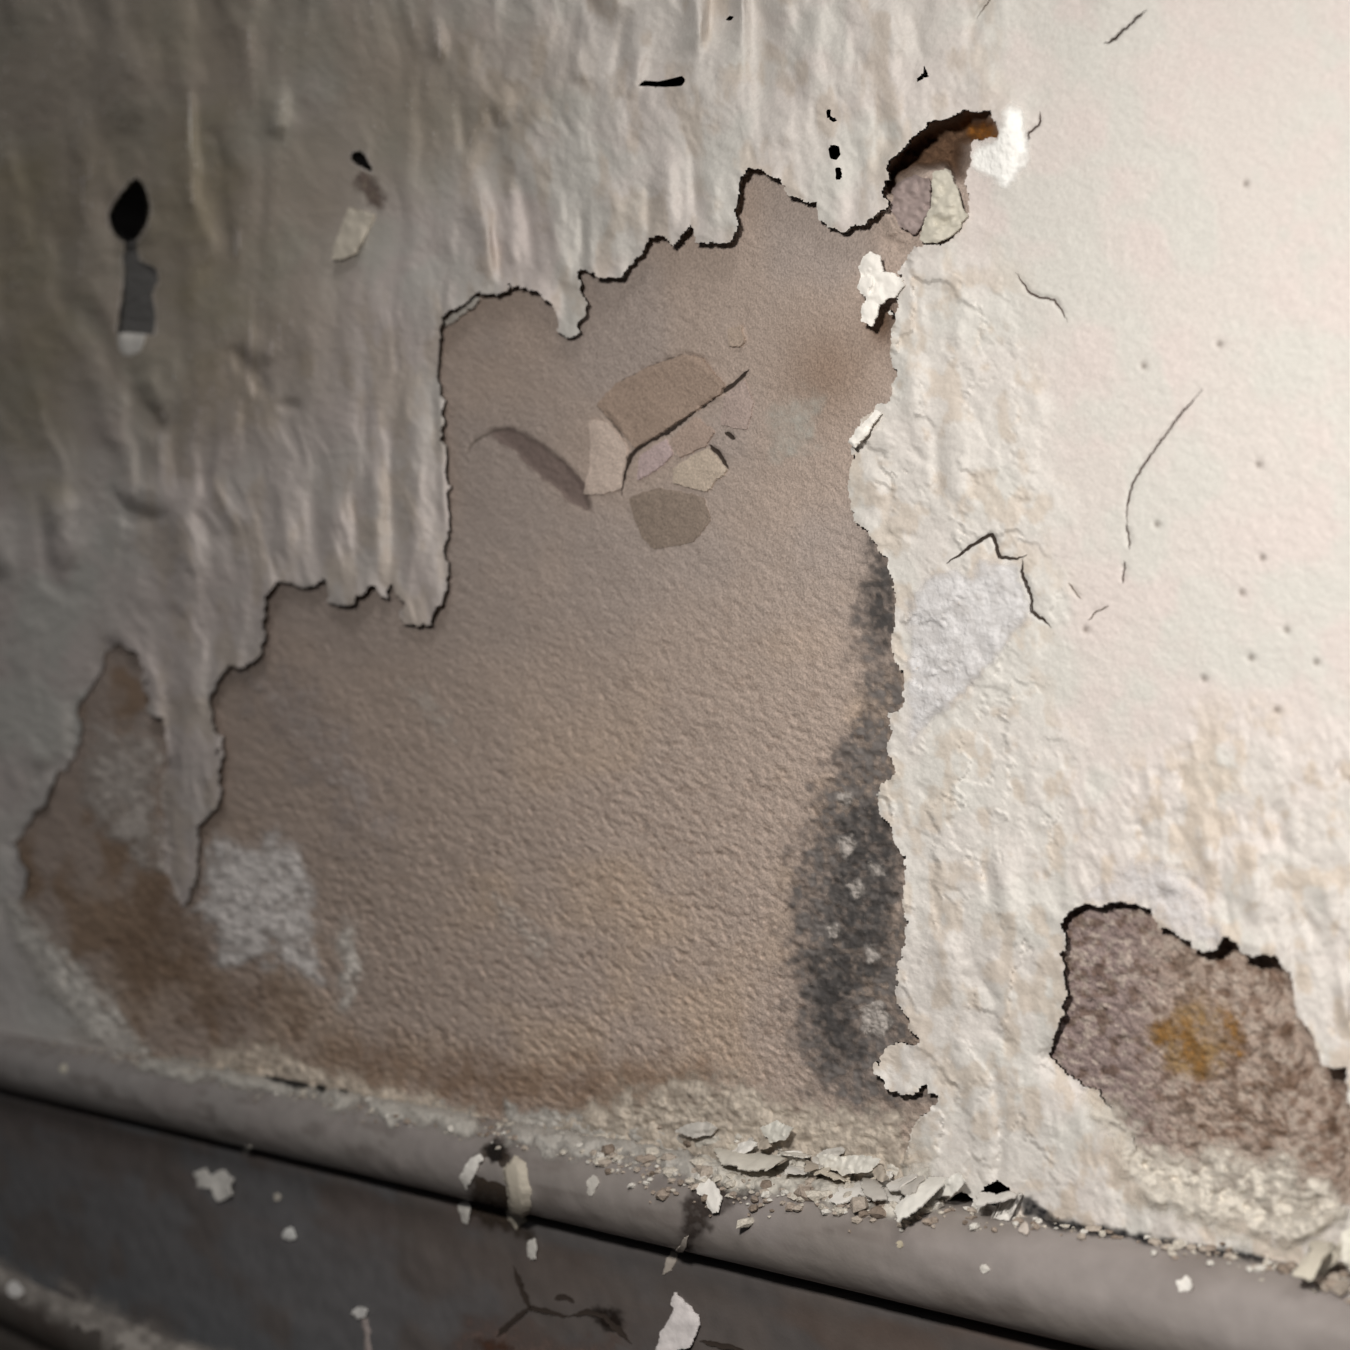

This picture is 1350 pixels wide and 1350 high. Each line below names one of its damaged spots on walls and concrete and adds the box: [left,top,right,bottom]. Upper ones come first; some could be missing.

spalling [16,110,1076,1223]
crack [946,533,1051,627]
crack [1068,391,1201,620]
damp [85,725,167,871]
damp [193,833,361,1010]
damp [504,566,929,1205]
spalling [1049,878,1350,1205]
peeling [457,1138,537,1260]
damp [877,1195,905,1217]